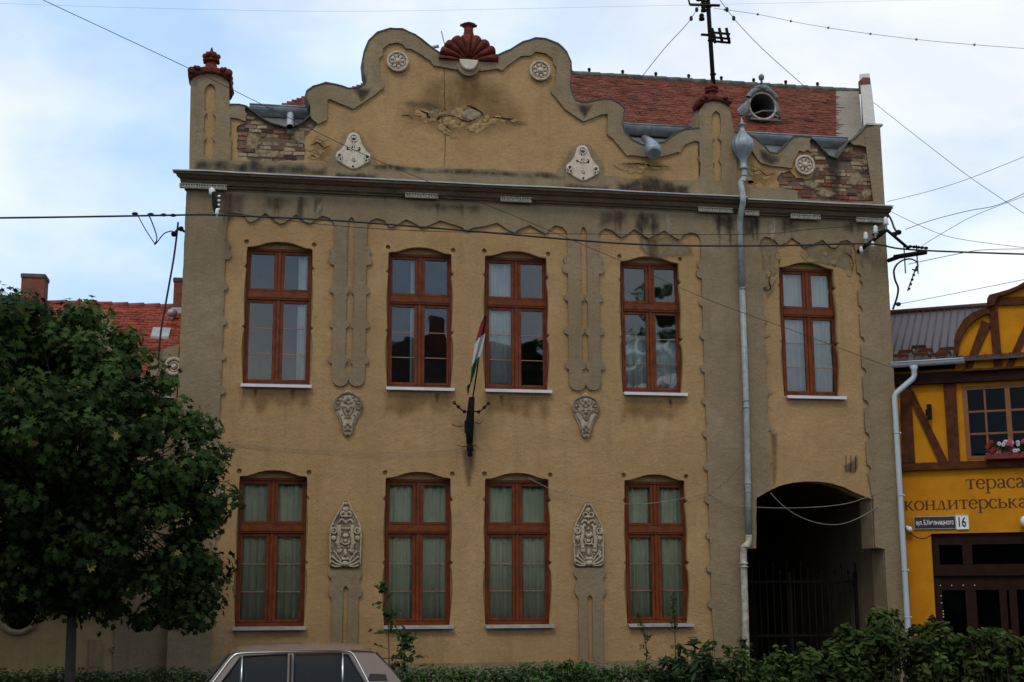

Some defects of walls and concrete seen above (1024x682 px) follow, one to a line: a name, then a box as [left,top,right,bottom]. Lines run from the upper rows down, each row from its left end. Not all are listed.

flaking render [237,116,331,162]
flaking render [746,145,873,202]
water stain [637,214,691,257]